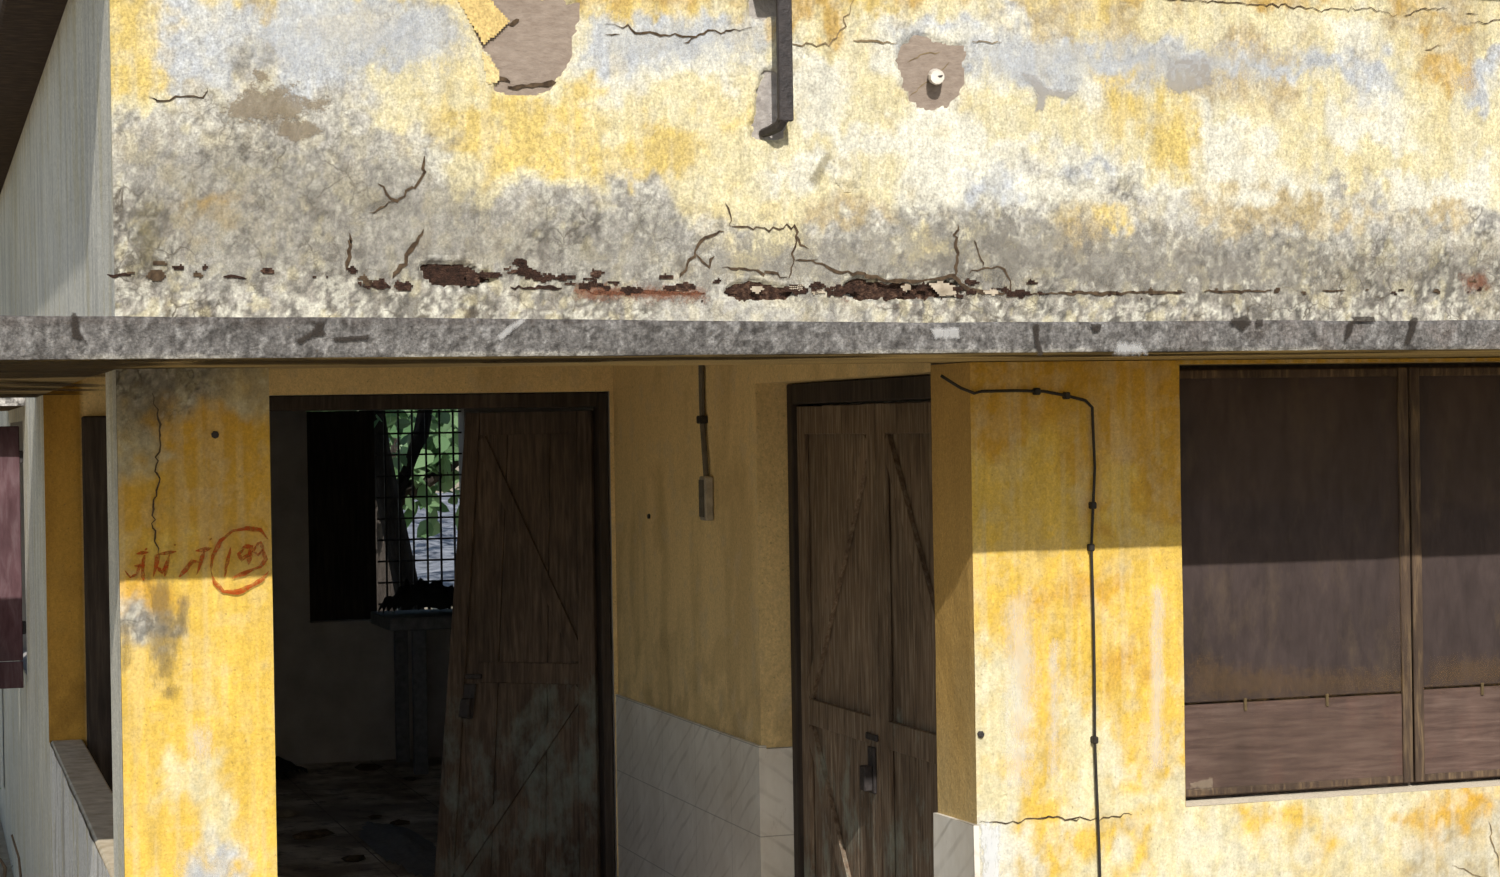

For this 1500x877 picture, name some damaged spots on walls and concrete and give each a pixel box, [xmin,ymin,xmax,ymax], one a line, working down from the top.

flaking render [458,0,580,96]
flaking render [895,35,966,111]
crack [1170,0,1500,50]
crack [345,156,426,289]
crack [107,271,131,279]
flaking render [127,261,208,281]
crack [223,272,247,280]
flaking render [346,258,643,295]
flaking render [659,273,1043,302]
crack [511,203,1271,296]
crack [151,393,162,556]
crack [979,813,1131,824]